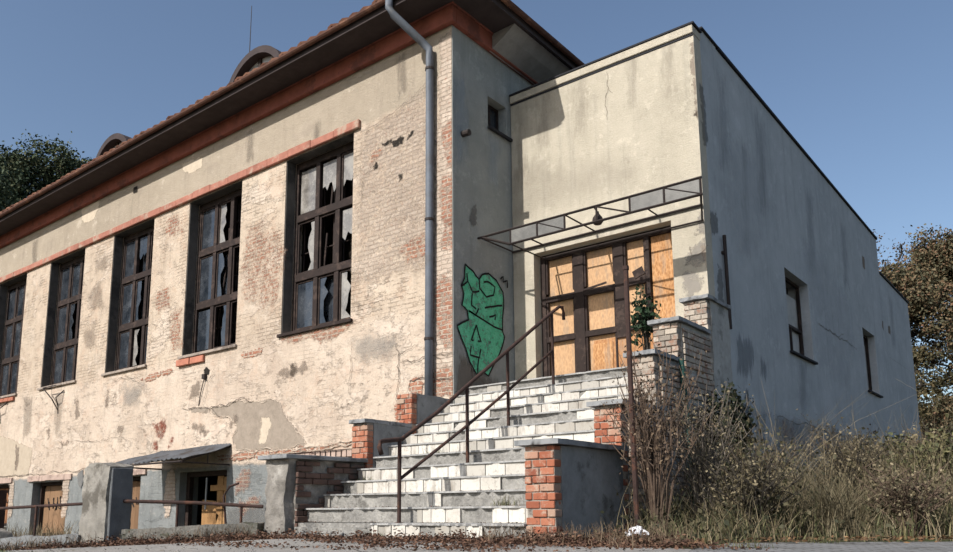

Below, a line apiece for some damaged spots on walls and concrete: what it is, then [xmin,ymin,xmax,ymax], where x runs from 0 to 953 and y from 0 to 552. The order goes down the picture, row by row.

flaking render [182,156,203,174]
flaking render [81,200,100,223]
flaking render [165,214,183,237]
flaking render [356,32,453,397]
flaking render [682,214,706,296]
flaking render [156,288,183,351]
peeling [278,361,307,378]
spalling [188,367,353,462]
flaking render [7,447,19,519]
flaking render [61,470,84,518]
flaking render [164,468,177,518]